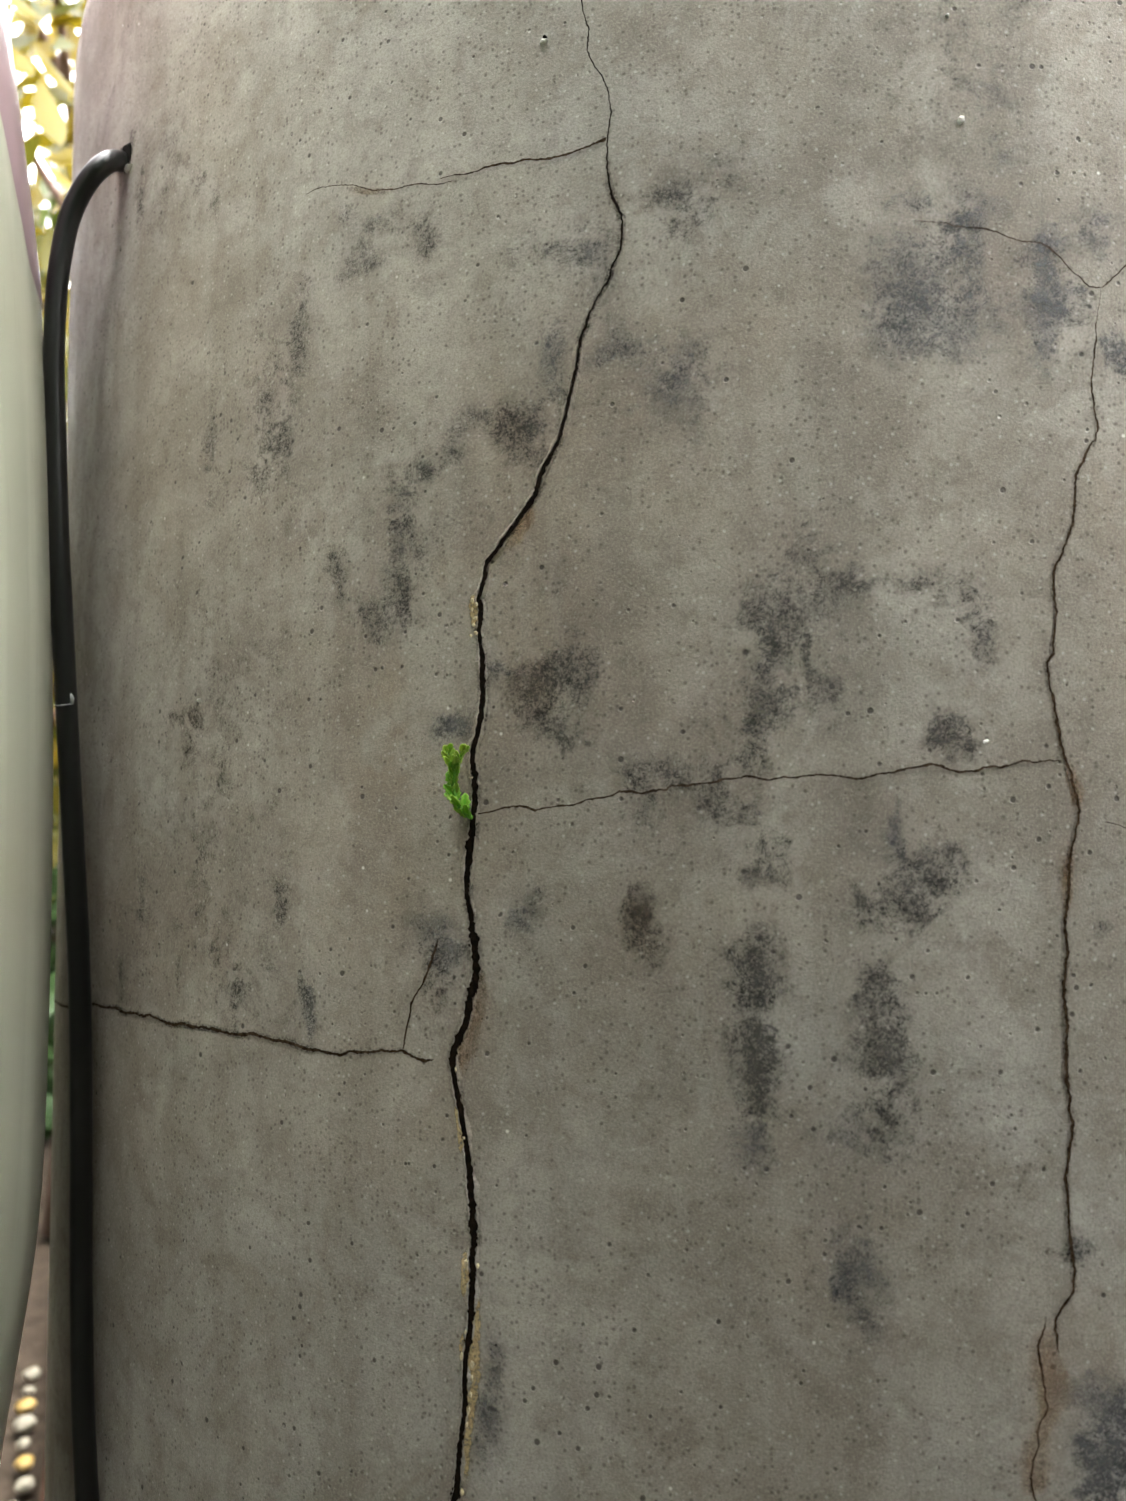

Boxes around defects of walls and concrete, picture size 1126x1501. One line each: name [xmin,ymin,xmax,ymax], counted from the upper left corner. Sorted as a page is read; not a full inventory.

crack [308,0,1126,1501]
crack [92,940,438,1063]
damp [725,932,788,1114]
damp [839,963,906,1144]